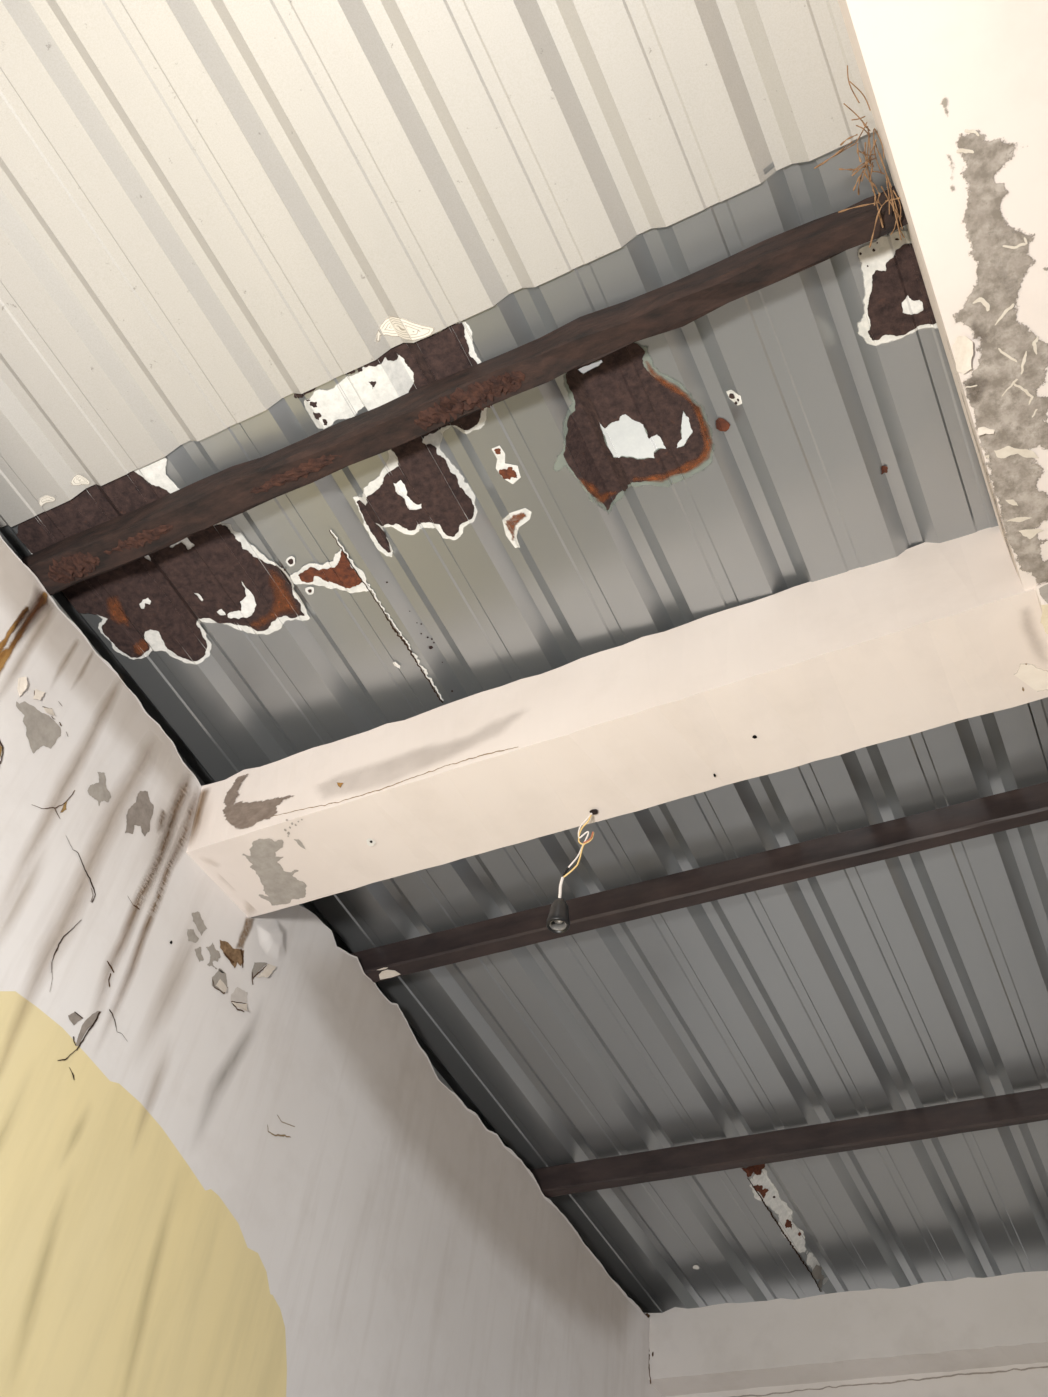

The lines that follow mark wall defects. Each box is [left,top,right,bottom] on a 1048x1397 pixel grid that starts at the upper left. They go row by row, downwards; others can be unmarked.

rust [858,231,938,346]
rust [16,457,179,554]
rust [294,321,481,429]
rust [353,407,487,557]
rust [492,446,521,484]
rust [554,343,730,513]
peeling [948,130,1048,634]
rust [0,522,453,703]
peeling [16,677,68,754]
peeling [223,774,306,905]
peeling [187,911,276,1012]
rust [742,1164,828,1292]